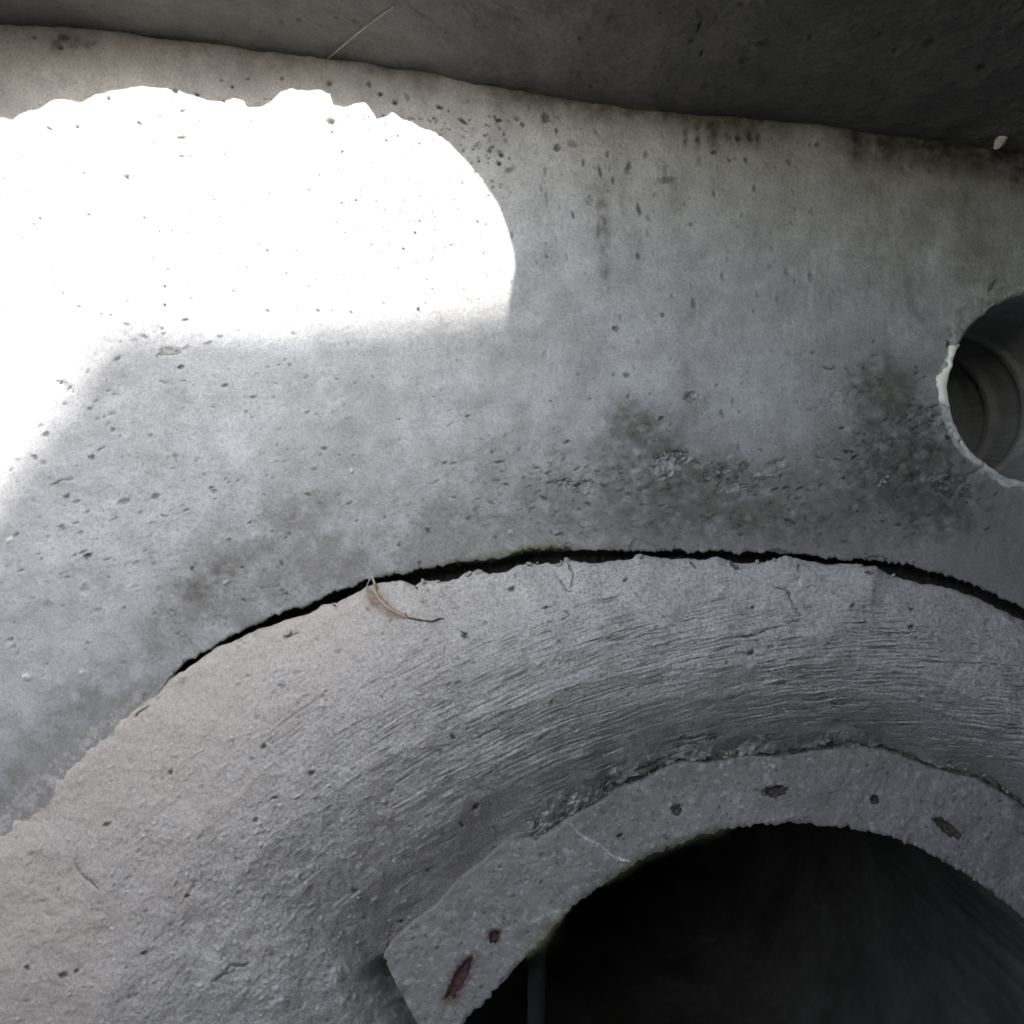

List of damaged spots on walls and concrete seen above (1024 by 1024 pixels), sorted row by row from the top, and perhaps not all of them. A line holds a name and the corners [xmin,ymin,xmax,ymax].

damp [621,413,805,539]
damp [856,433,971,529]
crack [173,539,1024,677]
crack [534,733,1024,836]
corrosion [443,955,473,1000]
corrosion [489,930,500,945]